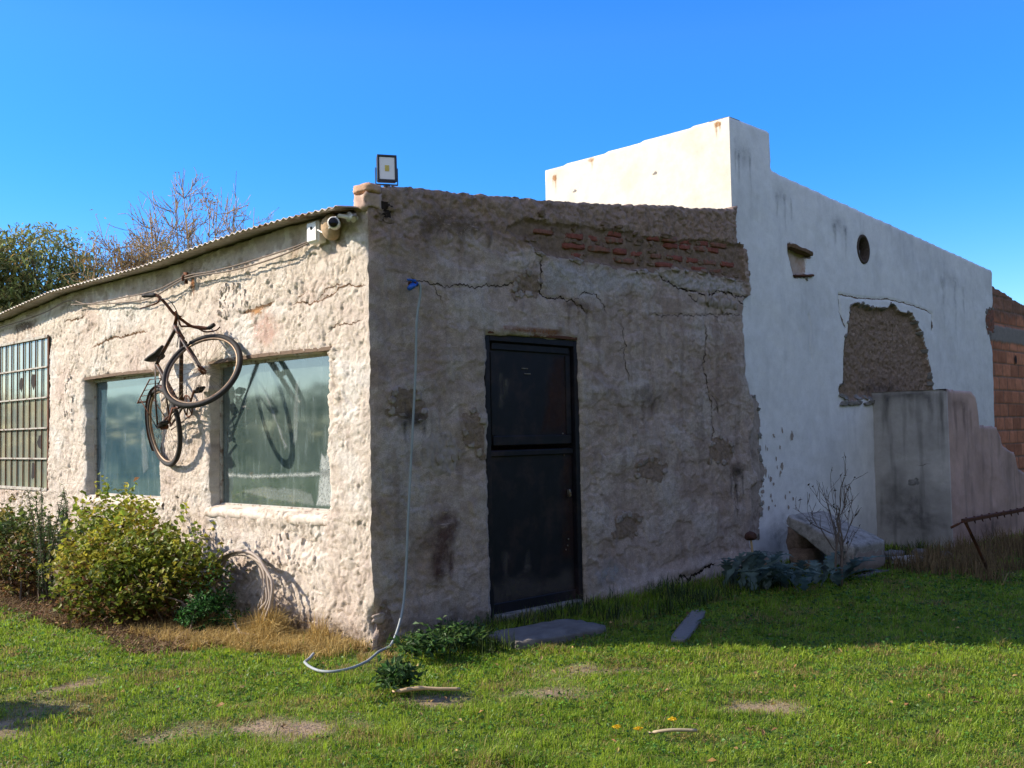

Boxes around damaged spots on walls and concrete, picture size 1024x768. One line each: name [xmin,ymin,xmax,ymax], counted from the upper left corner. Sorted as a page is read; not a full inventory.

flaking render [506,209,746,282]
crack [243,283,364,314]
crack [406,258,629,381]
crack [651,276,747,437]
flaking render [838,301,934,406]
peeling [749,395,794,540]
damp [432,516,457,575]
crack [678,563,715,584]